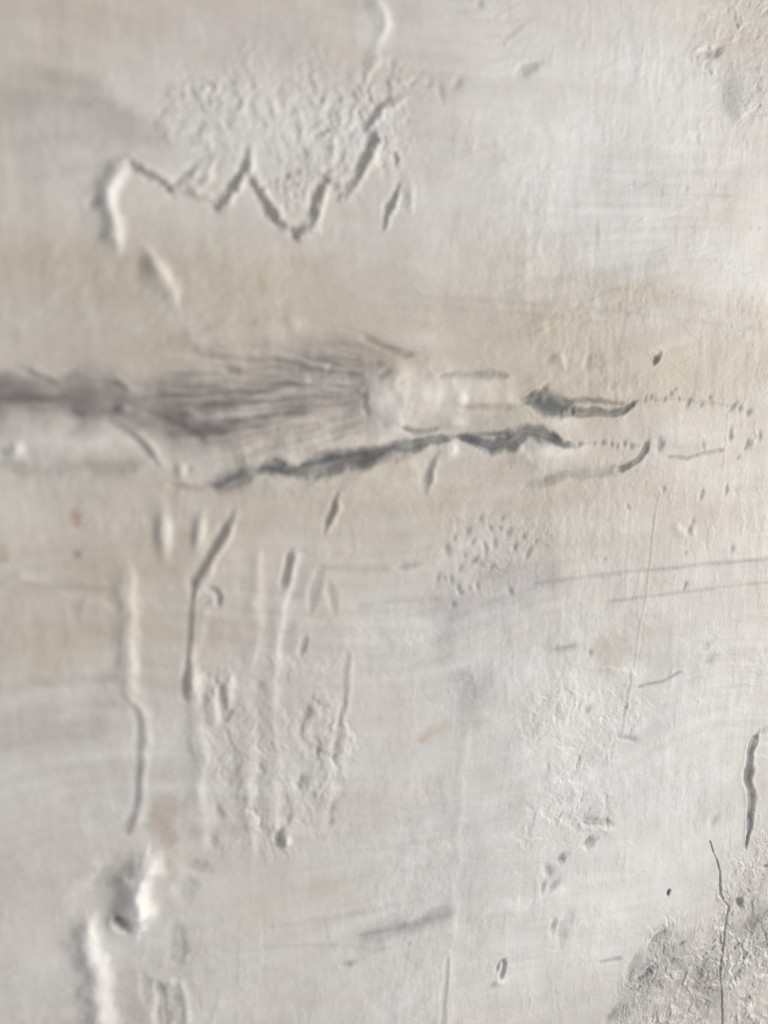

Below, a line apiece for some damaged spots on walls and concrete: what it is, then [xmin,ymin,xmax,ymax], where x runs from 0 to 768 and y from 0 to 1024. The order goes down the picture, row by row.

crack [165,383,755,500]
crack [739,724,768,851]
flaking render [600,859,768,1024]